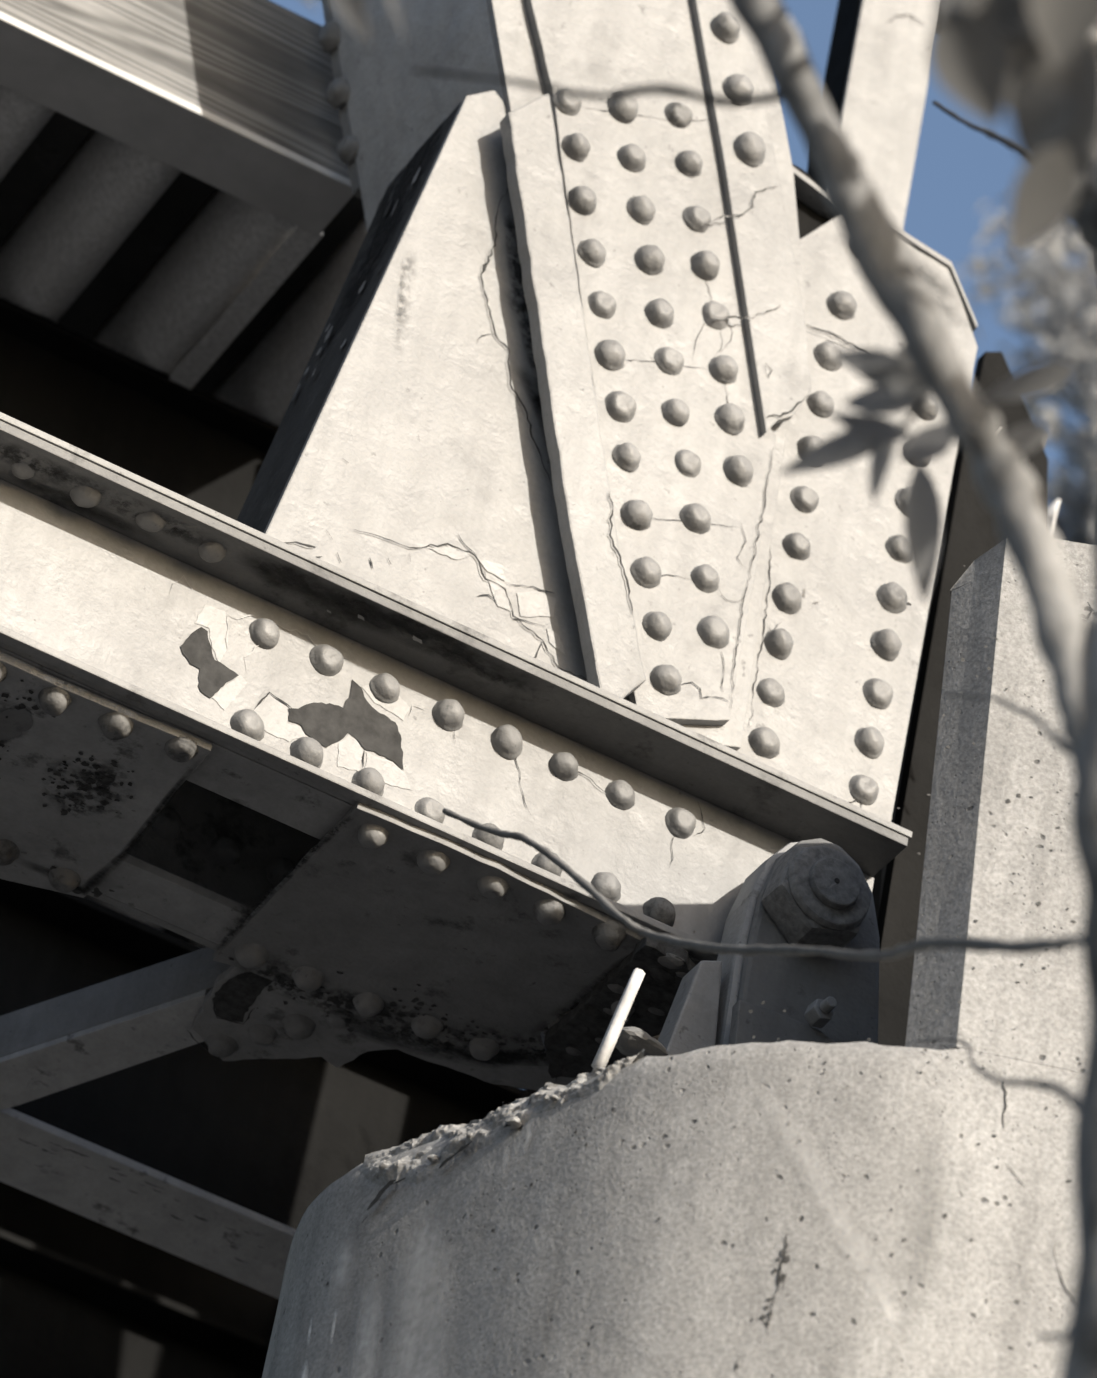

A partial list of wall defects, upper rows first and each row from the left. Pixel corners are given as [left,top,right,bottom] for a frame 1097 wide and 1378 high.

crack [625,281,858,403]
corrosion [0,656,81,760]
corrosion [42,752,134,815]
peeling [180,605,316,710]
peeling [253,680,425,790]
crack [355,529,585,681]
crack [654,450,781,730]
peeling [212,972,273,1024]